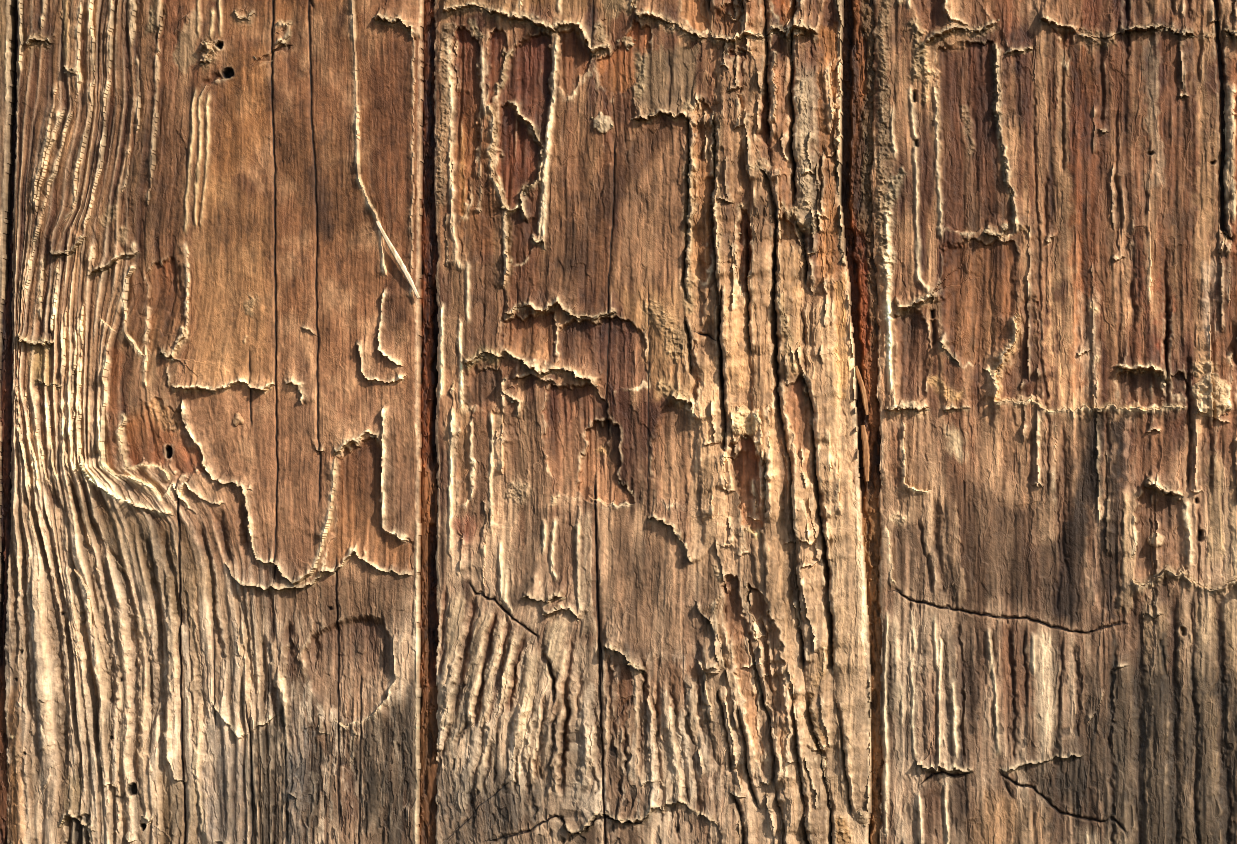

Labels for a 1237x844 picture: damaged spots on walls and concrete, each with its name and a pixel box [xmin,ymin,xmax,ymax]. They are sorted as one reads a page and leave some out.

spalling [145,256,189,361]
spalling [440,0,823,301]
peeling [835,0,848,268]
spalling [884,0,1201,418]
spalling [115,377,415,593]
crack [443,475,648,844]
spalling [454,296,703,566]
spalling [728,435,767,534]
spalling [784,374,818,486]
crack [889,590,1121,633]
spalling [1126,476,1237,596]
crack [918,768,1129,839]